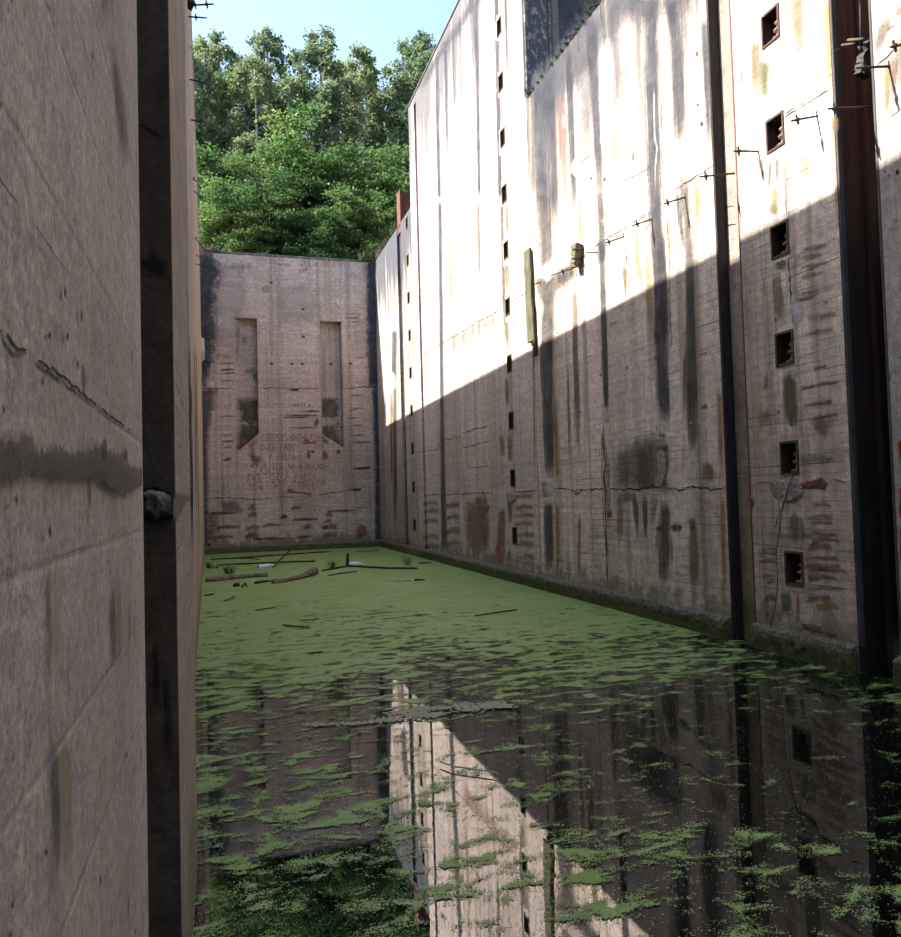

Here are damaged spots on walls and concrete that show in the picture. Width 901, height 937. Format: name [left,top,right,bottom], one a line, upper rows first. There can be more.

leakage [701,23,711,136]
leakage [533,0,684,469]
leakage [676,185,700,440]
crack [0,330,131,431]
leakage [200,253,244,546]
leakage [0,432,142,495]
corrosion [467,497,505,564]
leakage [544,504,553,567]
crack [514,425,723,589]
leakage [617,434,667,535]
leakage [656,507,672,578]